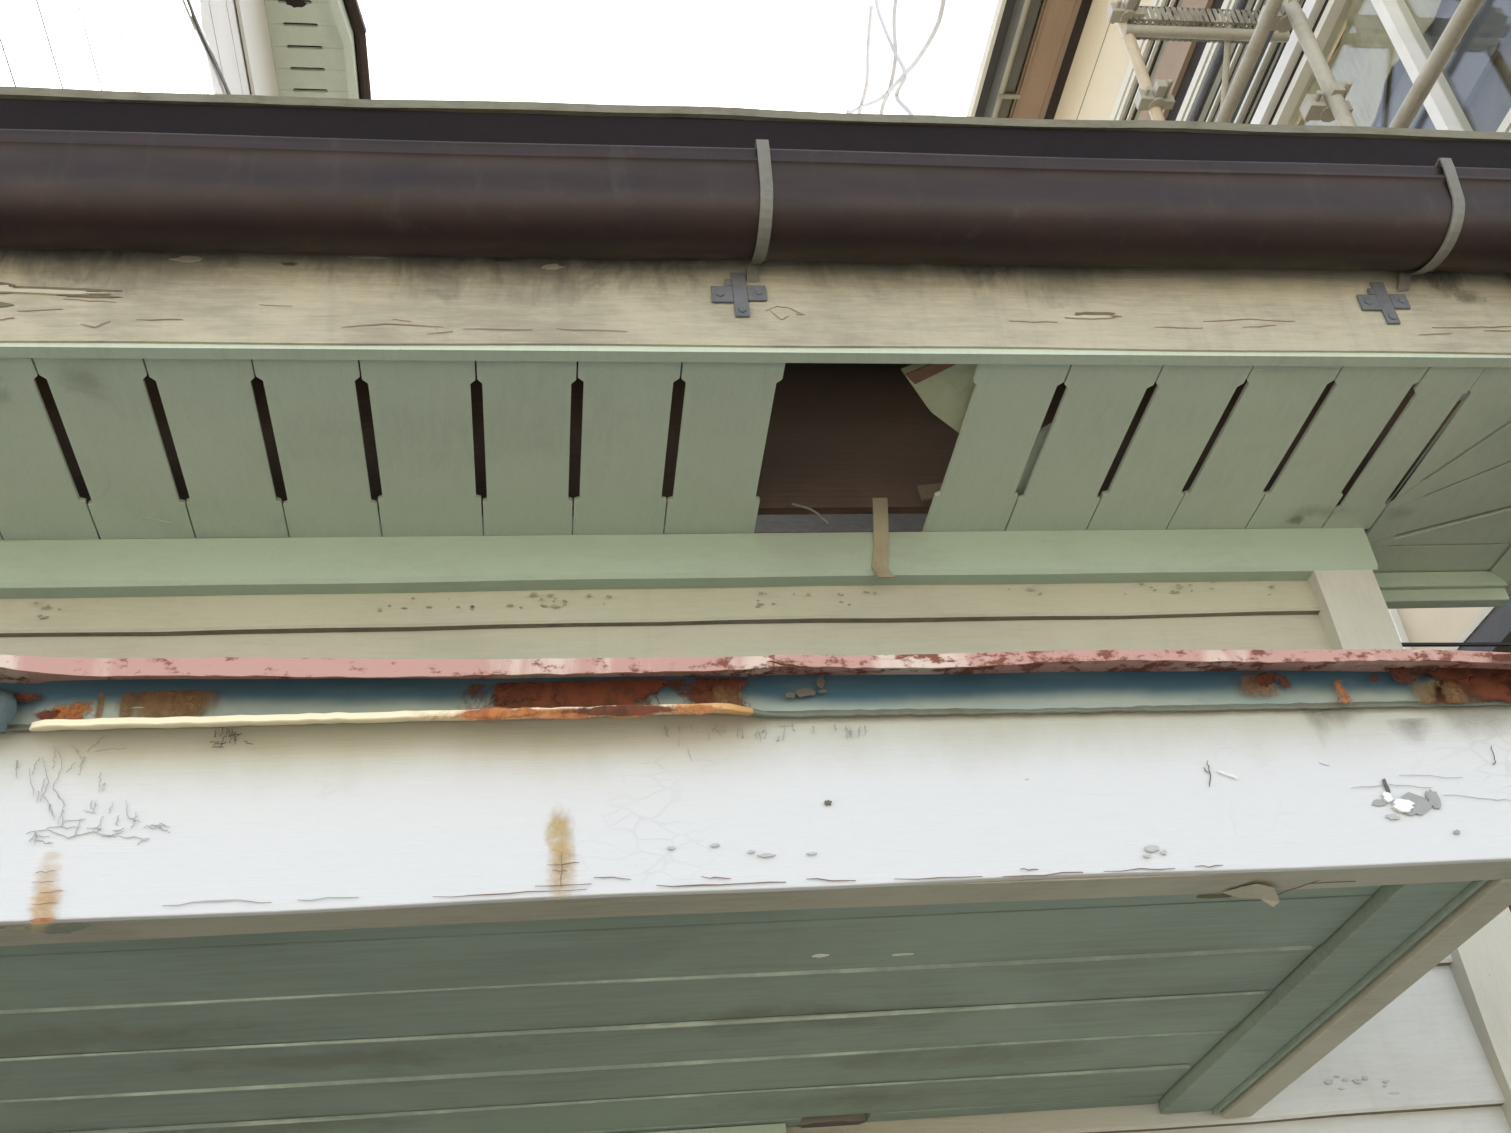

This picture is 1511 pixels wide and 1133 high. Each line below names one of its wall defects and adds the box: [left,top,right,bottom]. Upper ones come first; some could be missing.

peeling [0,282,123,307]
rust [14,690,211,720]
rust [433,678,750,720]
rust [1242,672,1291,696]
rust [1334,681,1352,704]
rust [1369,653,1511,704]
crack [15,736,170,846]
rust [547,822,588,887]
rust [32,871,63,922]